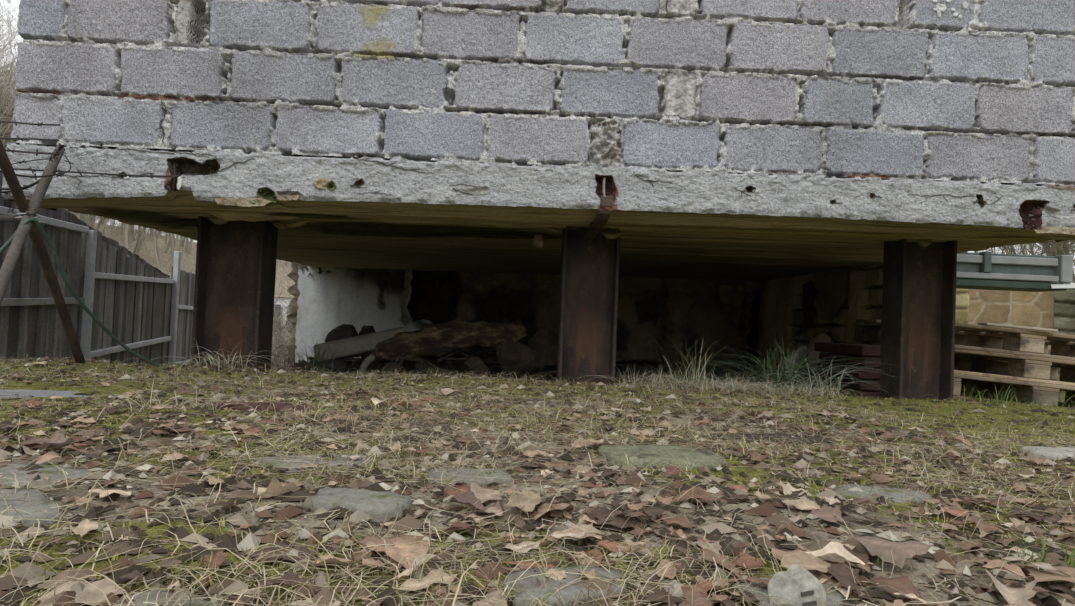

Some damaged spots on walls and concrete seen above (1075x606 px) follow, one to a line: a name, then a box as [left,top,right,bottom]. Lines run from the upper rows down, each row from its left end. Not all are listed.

spalling [164,157,220,191]